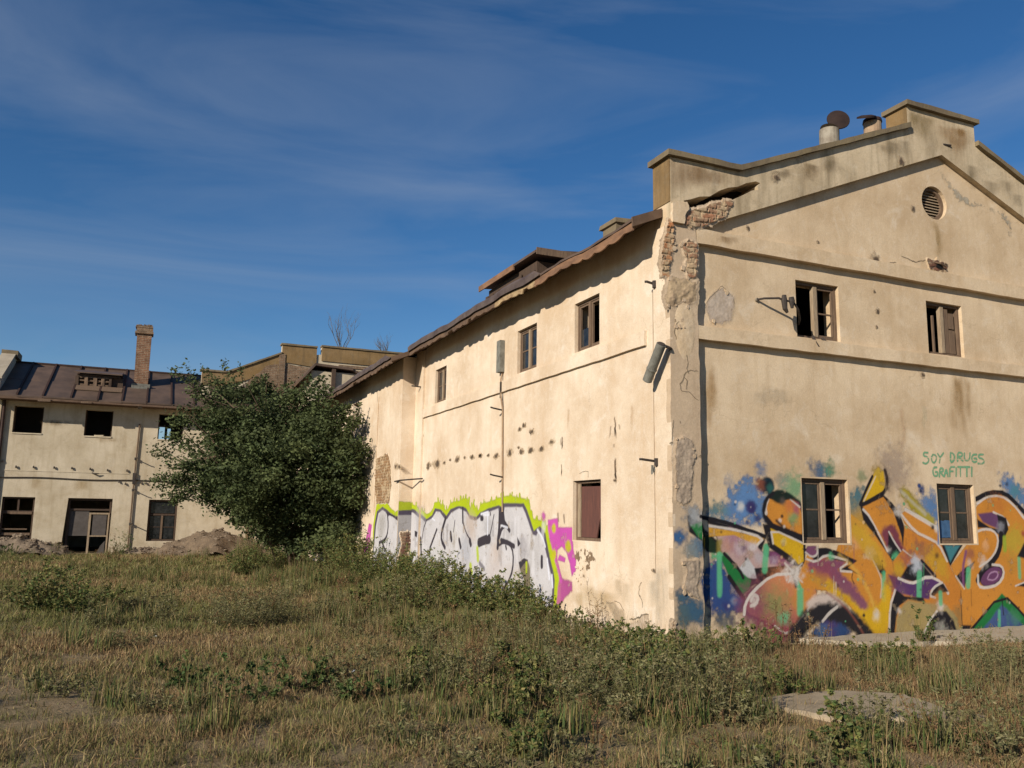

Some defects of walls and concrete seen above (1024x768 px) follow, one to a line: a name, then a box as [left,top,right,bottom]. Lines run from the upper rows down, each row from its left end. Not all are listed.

flaking render [657,198,737,329]
flaking render [925,257,948,273]
flaking render [374,451,401,505]
spalling [426,422,554,470]
flaking render [671,432,702,508]